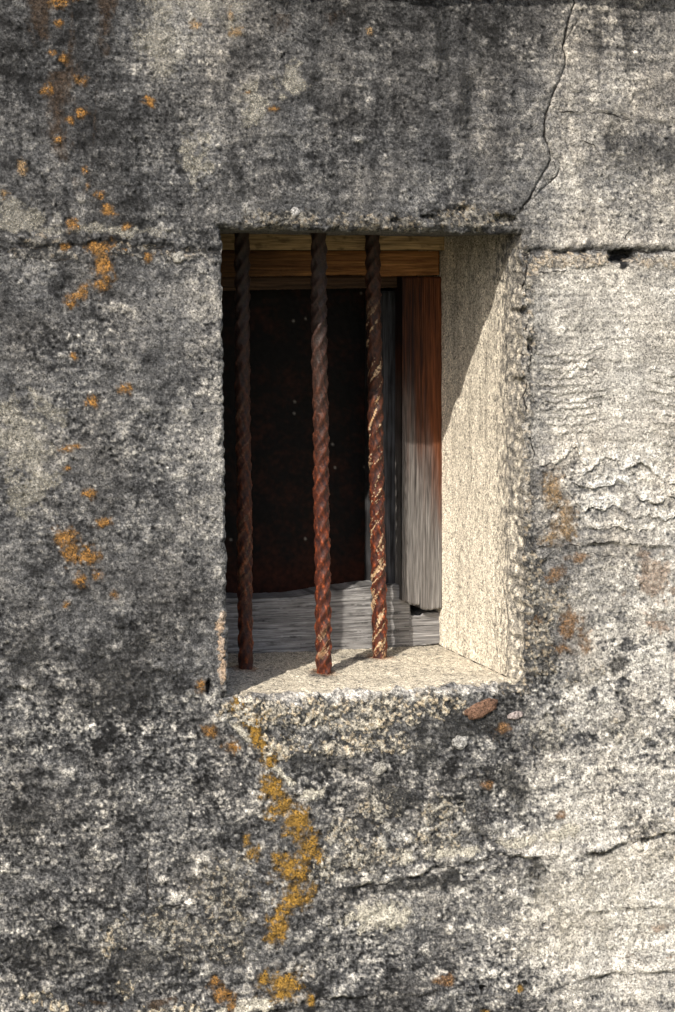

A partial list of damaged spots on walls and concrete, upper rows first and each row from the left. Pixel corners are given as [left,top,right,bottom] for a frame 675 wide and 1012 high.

crack [391,0,675,459]
spalling [215,248,675,884]